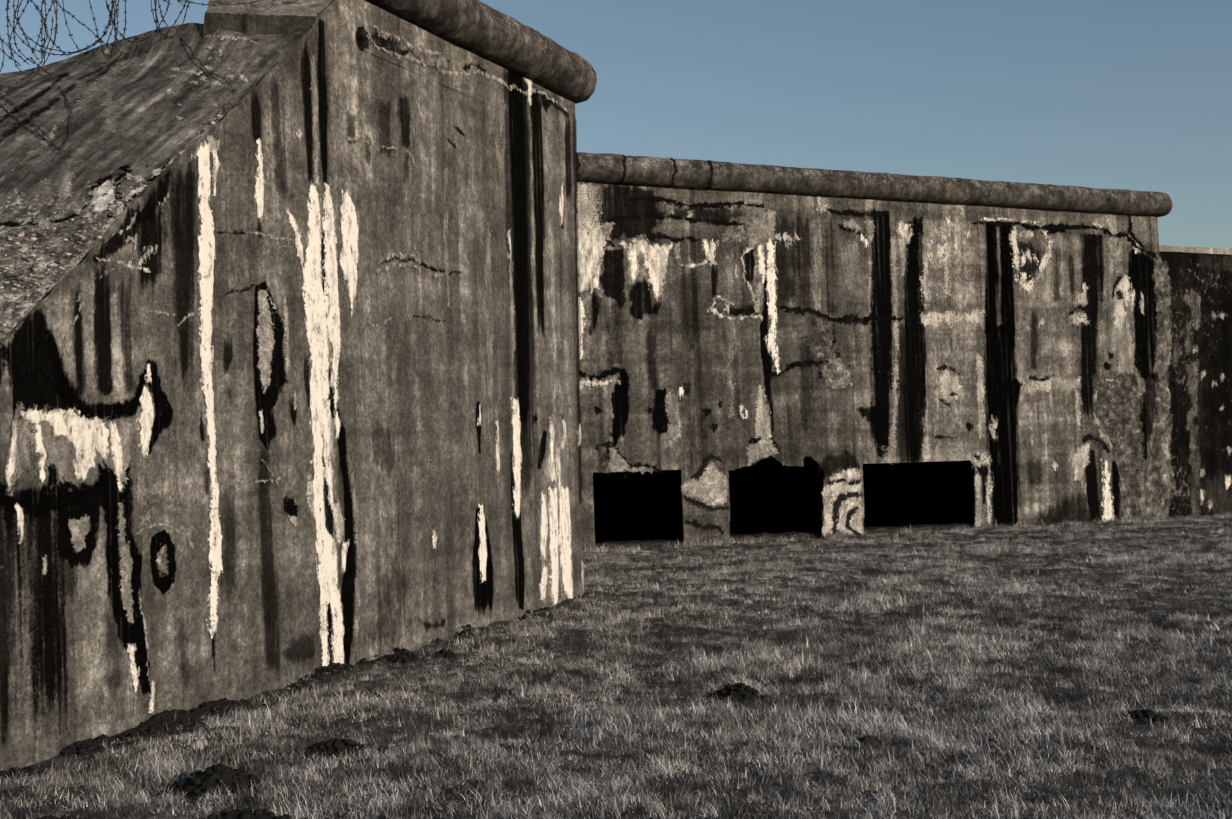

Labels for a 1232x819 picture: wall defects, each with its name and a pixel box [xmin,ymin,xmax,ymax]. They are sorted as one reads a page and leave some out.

spalling [3,402,139,496]
leakage [0,135,233,744]
spalling [253,281,290,450]
crack [360,314,445,328]
crack [369,251,461,279]
leakage [476,70,737,610]
spalling [597,184,802,322]
leakage [753,216,823,432]
leakage [856,209,1158,526]
crack [972,215,1158,259]
leakage [1171,287,1232,517]
peeling [1199,468,1213,510]